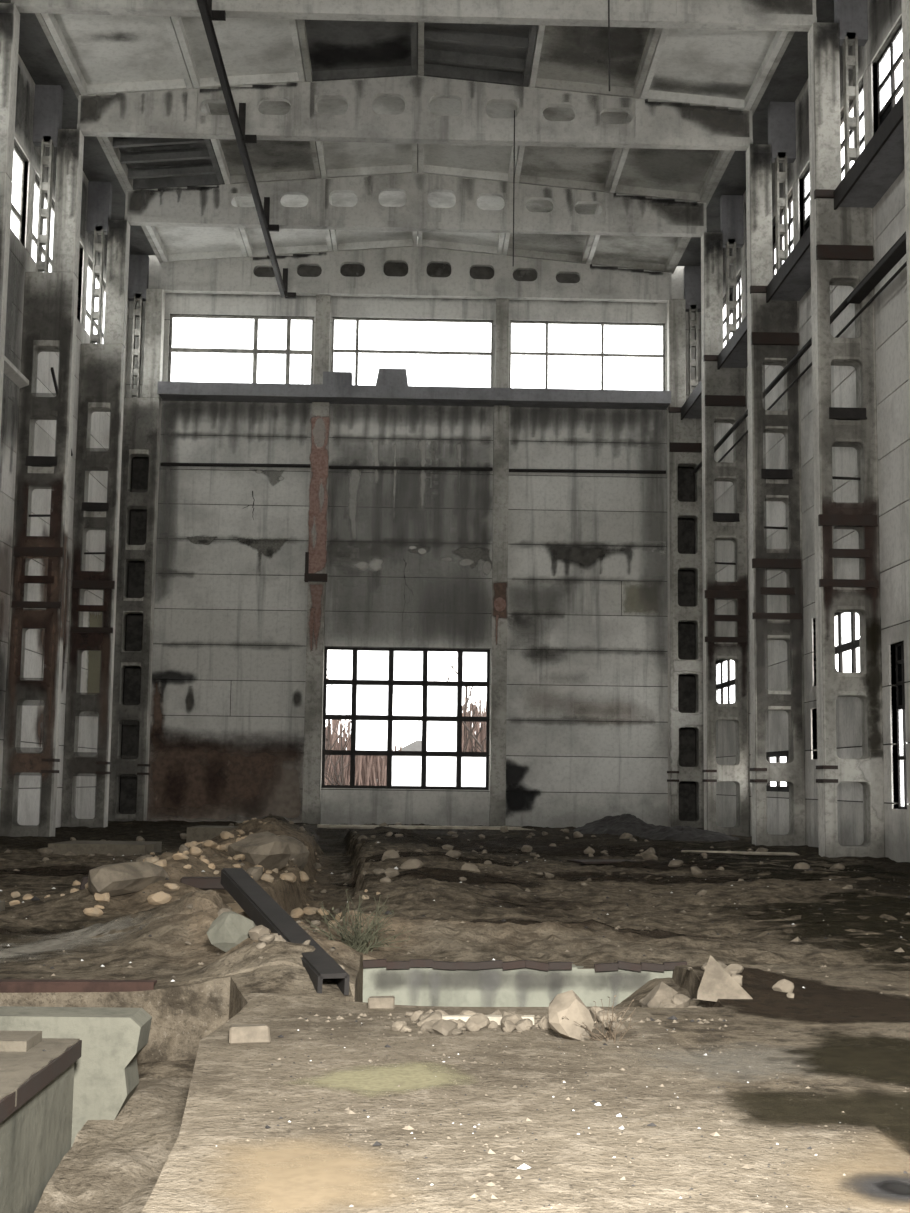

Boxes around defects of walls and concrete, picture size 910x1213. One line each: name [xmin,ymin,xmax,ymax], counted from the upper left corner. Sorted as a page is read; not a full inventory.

damp [310,37,410,67]
damp [166,82,314,115]
damp [0,5,237,279]
damp [0,241,268,822]
damp [330,440,489,637]
damp [547,544,632,574]
corrosion [308,584,323,651]
damp [153,756,303,821]
damp [506,761,540,815]